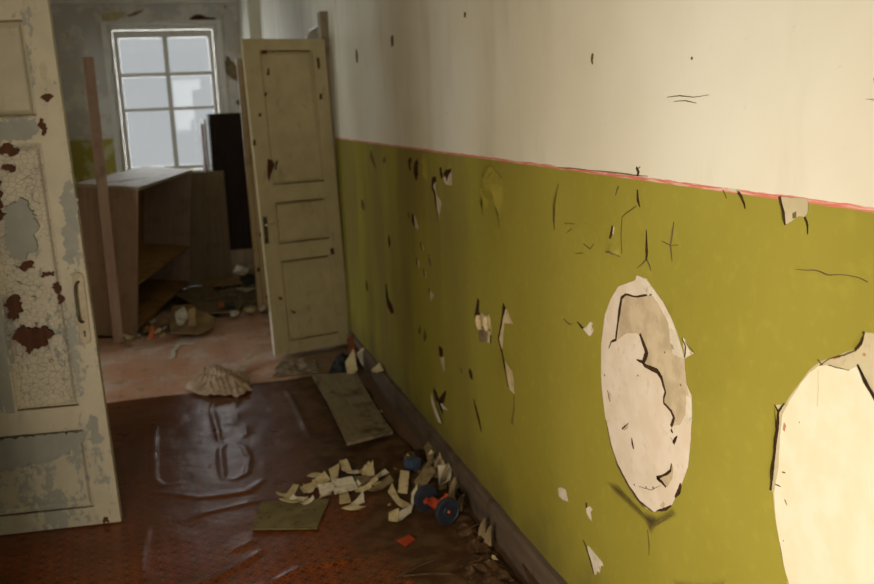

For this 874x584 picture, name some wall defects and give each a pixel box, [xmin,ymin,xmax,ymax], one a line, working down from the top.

peeling [777,196,808,234]
peeling [475,298,515,425]
peeling [564,275,692,512]
peeling [767,330,874,584]
peeling [583,540,604,575]